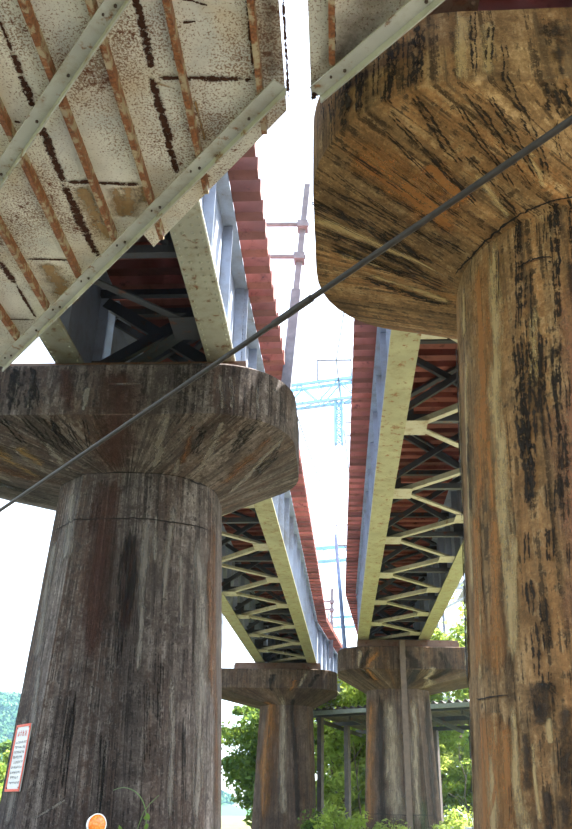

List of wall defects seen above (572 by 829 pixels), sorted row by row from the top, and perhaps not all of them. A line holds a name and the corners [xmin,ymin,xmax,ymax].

rust [0,21,35,107]
rust [132,0,155,68]
rust [150,1,255,174]
rust [282,0,290,97]
rust [0,262,36,320]
rust [39,127,147,257]
damp [312,26,469,307]
damp [381,12,572,522]
crack [456,196,572,280]
damp [488,246,572,829]
damp [143,544,208,821]
damp [377,695,405,823]